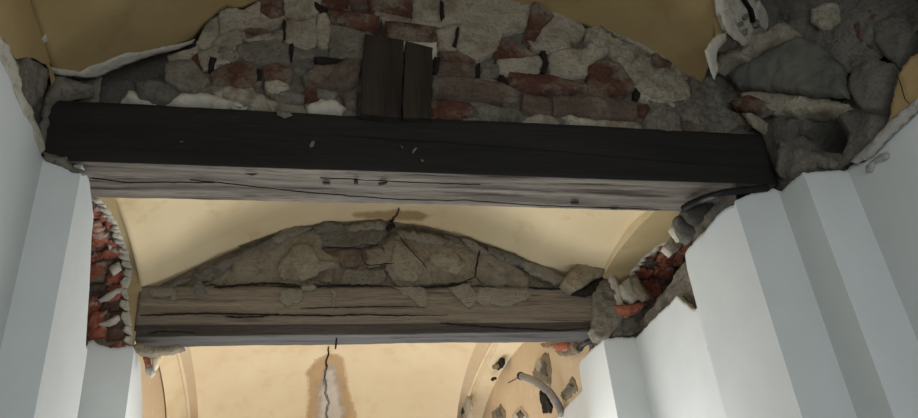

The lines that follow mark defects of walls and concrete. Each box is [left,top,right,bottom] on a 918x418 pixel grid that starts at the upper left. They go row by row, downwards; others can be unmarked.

spalling [0,35,195,176]
spalling [705,0,918,191]
spalling [86,197,185,378]
spalling [165,219,389,288]
crack [214,208,483,289]
spalling [461,237,565,287]
crack [528,284,560,292]
spalling [608,224,690,318]
crack [322,347,330,418]
spalling [491,358,505,381]
spalling [492,404,529,418]
spalling [532,342,580,414]